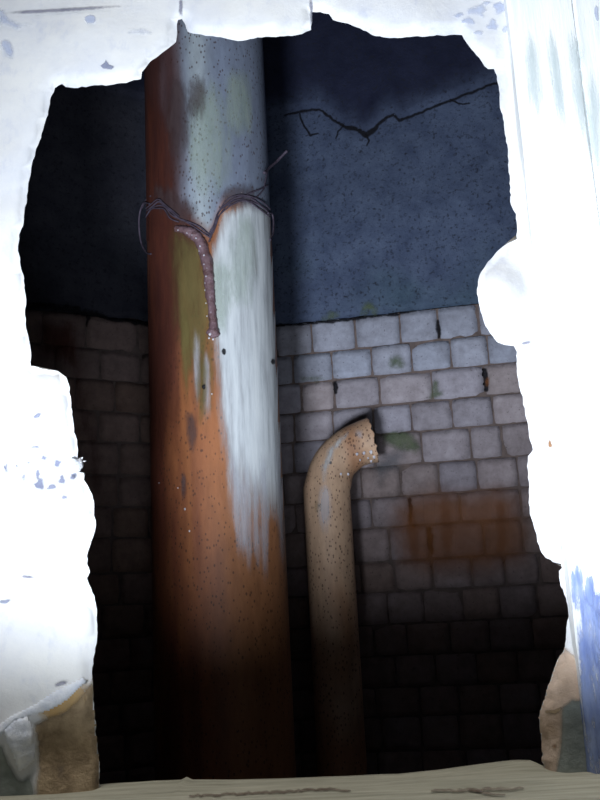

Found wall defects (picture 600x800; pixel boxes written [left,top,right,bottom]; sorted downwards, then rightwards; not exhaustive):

peeling [457,2,507,33]
crack [284,82,498,146]
rust [146,84,204,399]
leakage [213,206,283,505]
peeling [34,458,84,489]
peeling [538,566,600,774]
spalling [0,678,99,795]